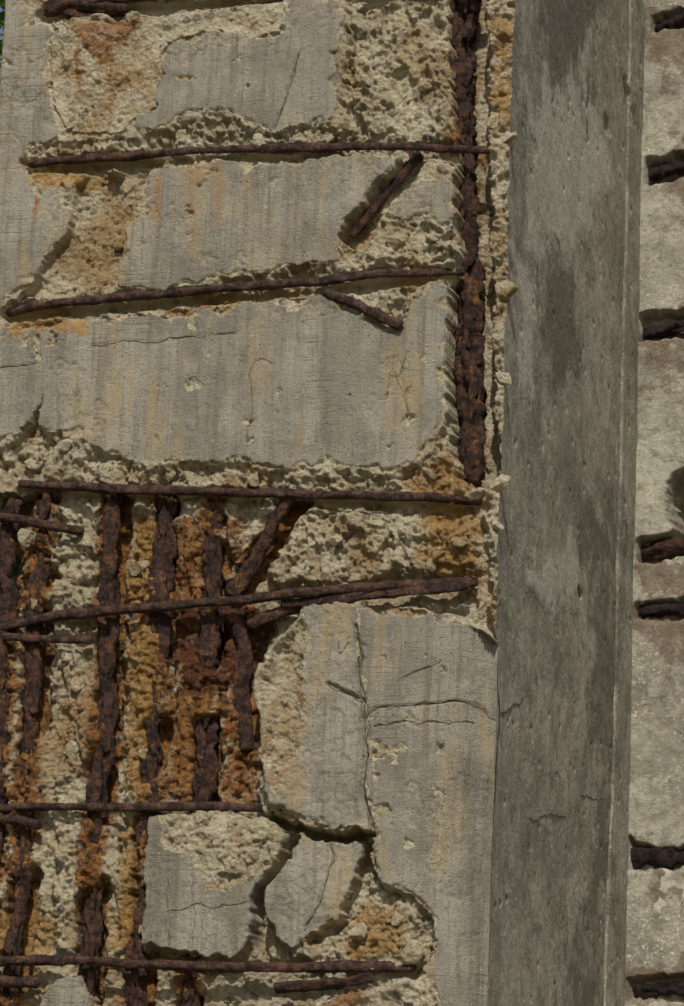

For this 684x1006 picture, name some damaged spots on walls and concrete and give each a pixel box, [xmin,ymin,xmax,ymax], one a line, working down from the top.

rust [15,162,128,229]
rust [47,0,145,133]
rust [603,5,684,224]
rust [0,309,103,345]
spalling [3,0,519,641]
spalling [0,398,442,1006]
rust [2,449,494,960]
crack [329,628,524,974]
leakage [504,0,684,1006]
rust [632,505,684,706]
rust [20,898,65,973]
rust [625,936,684,1006]